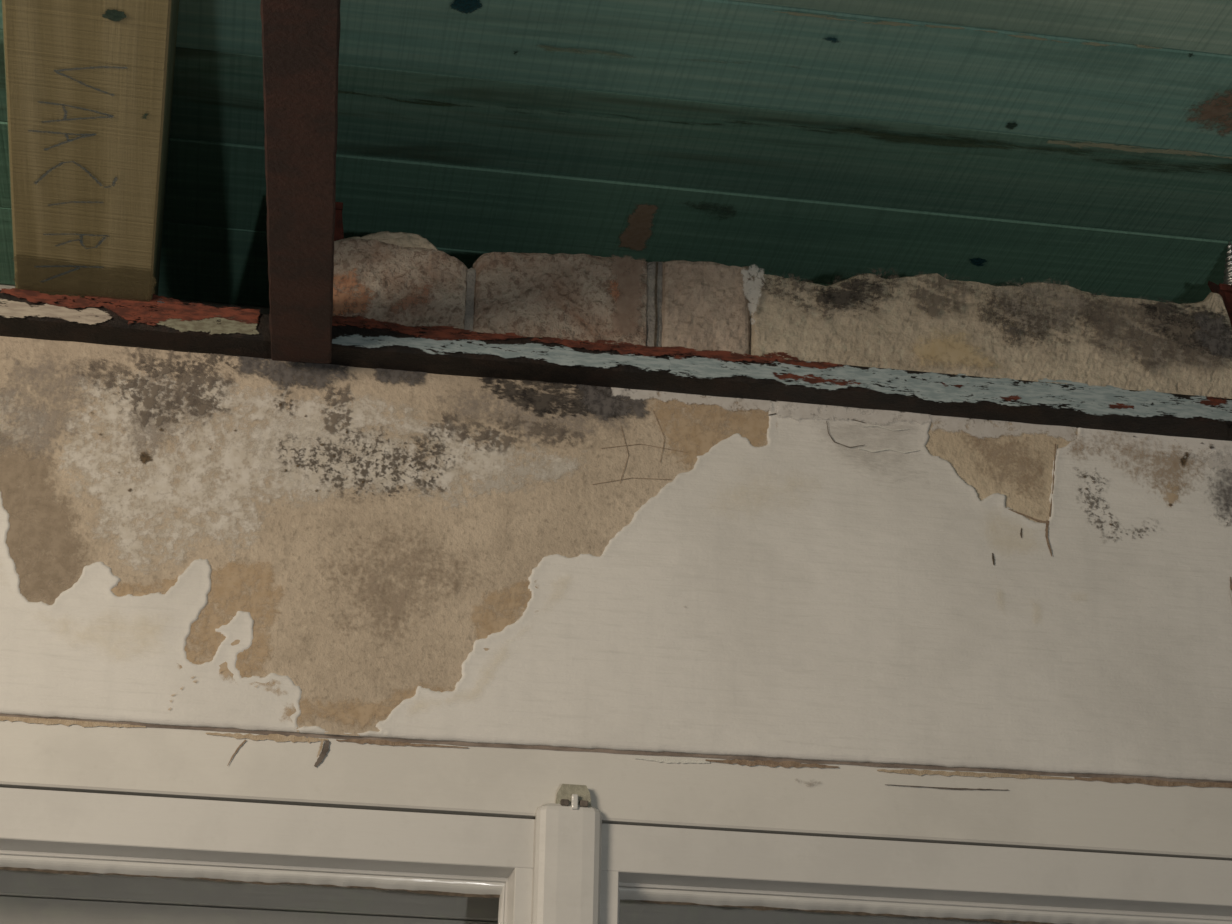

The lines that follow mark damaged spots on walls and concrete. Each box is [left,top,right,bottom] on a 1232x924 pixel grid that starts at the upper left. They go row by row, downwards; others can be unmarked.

water stain [761,269,1232,371]
peeling [0,336,769,767]
water stain [82,347,931,498]
peeling [925,415,1078,523]
water stain [1078,474,1154,541]
water stain [1116,438,1232,525]